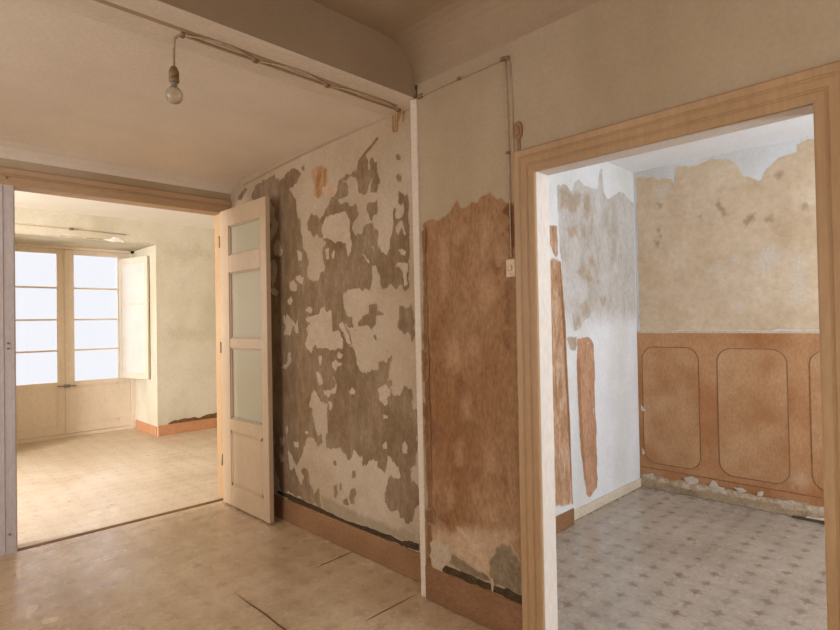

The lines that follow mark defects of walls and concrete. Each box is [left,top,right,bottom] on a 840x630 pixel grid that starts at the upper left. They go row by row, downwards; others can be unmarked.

peeling [238,152,522,605]
peeling [549,138,819,508]
flaking render [640,473,824,516]